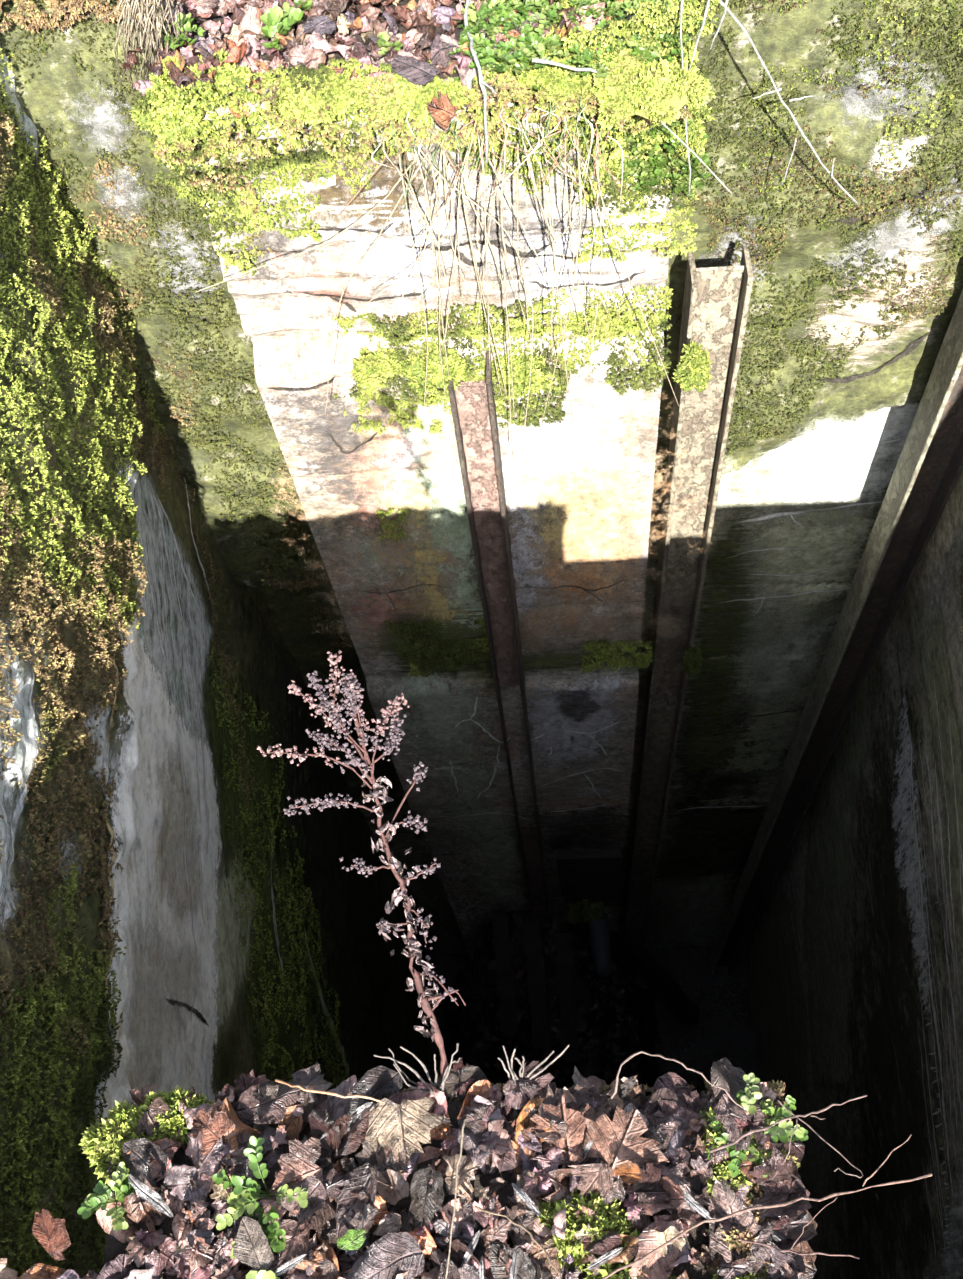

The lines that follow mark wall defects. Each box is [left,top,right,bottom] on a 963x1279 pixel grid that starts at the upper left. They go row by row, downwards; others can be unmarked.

crack [515,578,631,603]
rust [505,416,661,647]
water stain [743,402,920,609]
water stain [514,666,632,774]
water stain [745,891,808,1089]
water stain [832,603,963,1279]